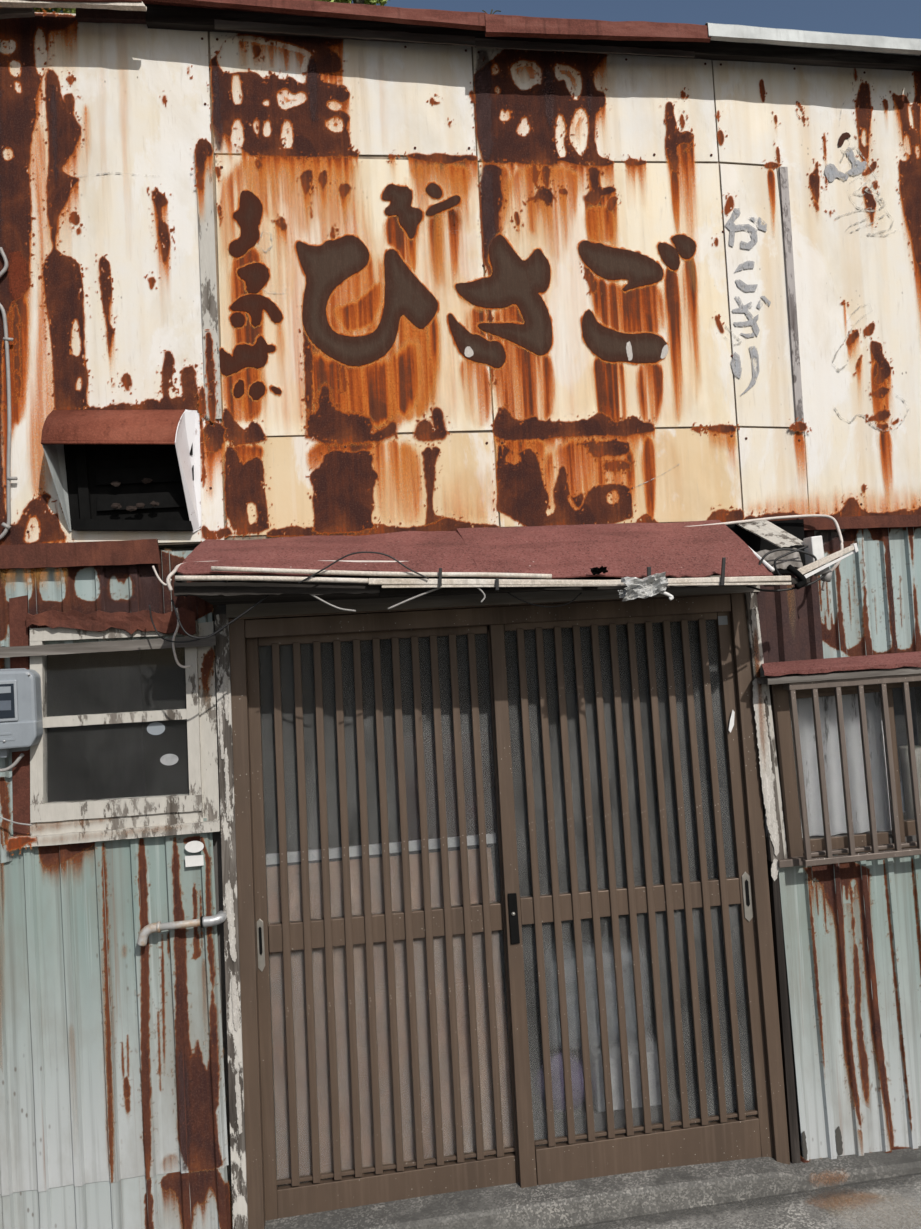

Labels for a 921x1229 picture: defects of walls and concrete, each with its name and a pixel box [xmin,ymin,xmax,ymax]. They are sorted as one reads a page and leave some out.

rust [0,7,724,546]
rust [715,110,728,145]
rust [722,193,737,216]
rust [852,68,921,312]
rust [692,422,740,456]
rust [707,297,921,667]
peeling [219,672,230,821]
peeling [752,678,779,881]
rust [0,777,233,1229]
peeling [225,883,239,1031]
rust [804,860,912,1153]